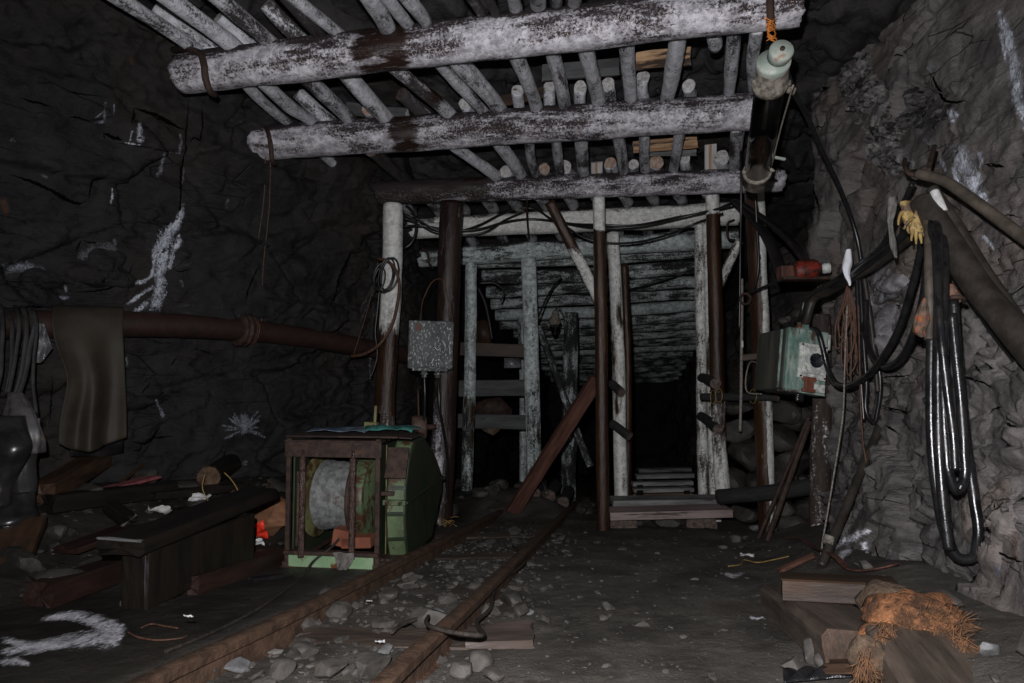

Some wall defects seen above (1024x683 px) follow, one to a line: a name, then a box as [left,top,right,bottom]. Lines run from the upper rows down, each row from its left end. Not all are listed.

water stain [998,11,1024,129]
water stain [130,208,184,312]